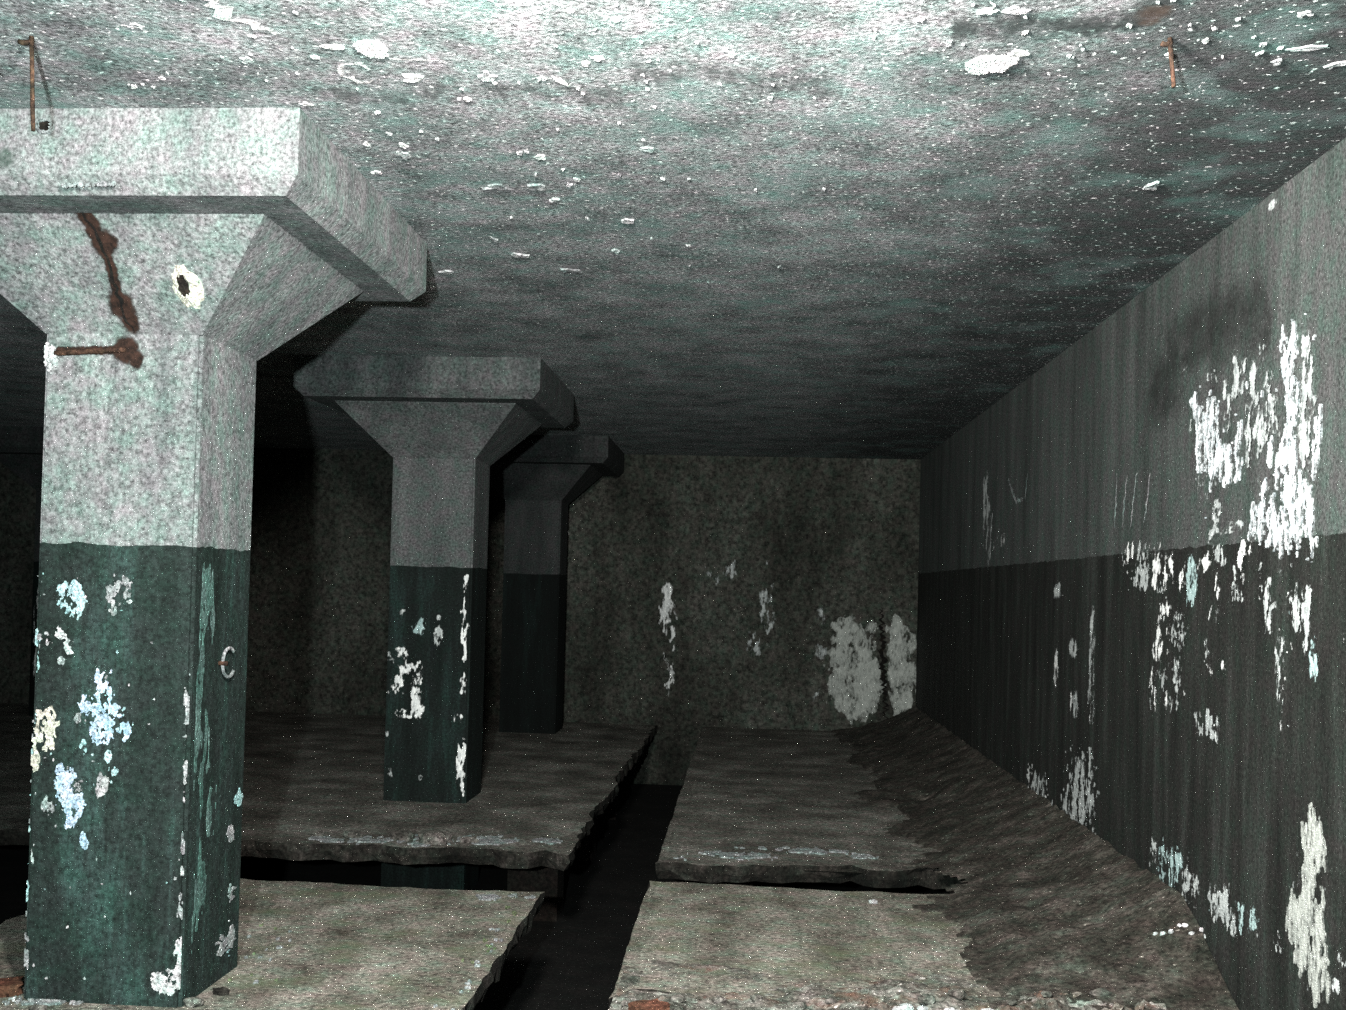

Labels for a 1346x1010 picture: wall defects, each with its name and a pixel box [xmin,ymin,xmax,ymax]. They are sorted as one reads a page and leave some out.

rust [56,213,144,369]
peeling [1122,314,1323,712]
peeling [33,573,89,674]
peeling [28,668,150,864]
peeling [106,574,133,616]
peeling [388,647,425,719]
peeling [413,615,443,645]
peeling [456,739,466,796]
peeling [460,574,469,694]
peeling [813,609,917,724]
peeling [1194,708,1219,743]
peeling [1275,802,1346,1008]